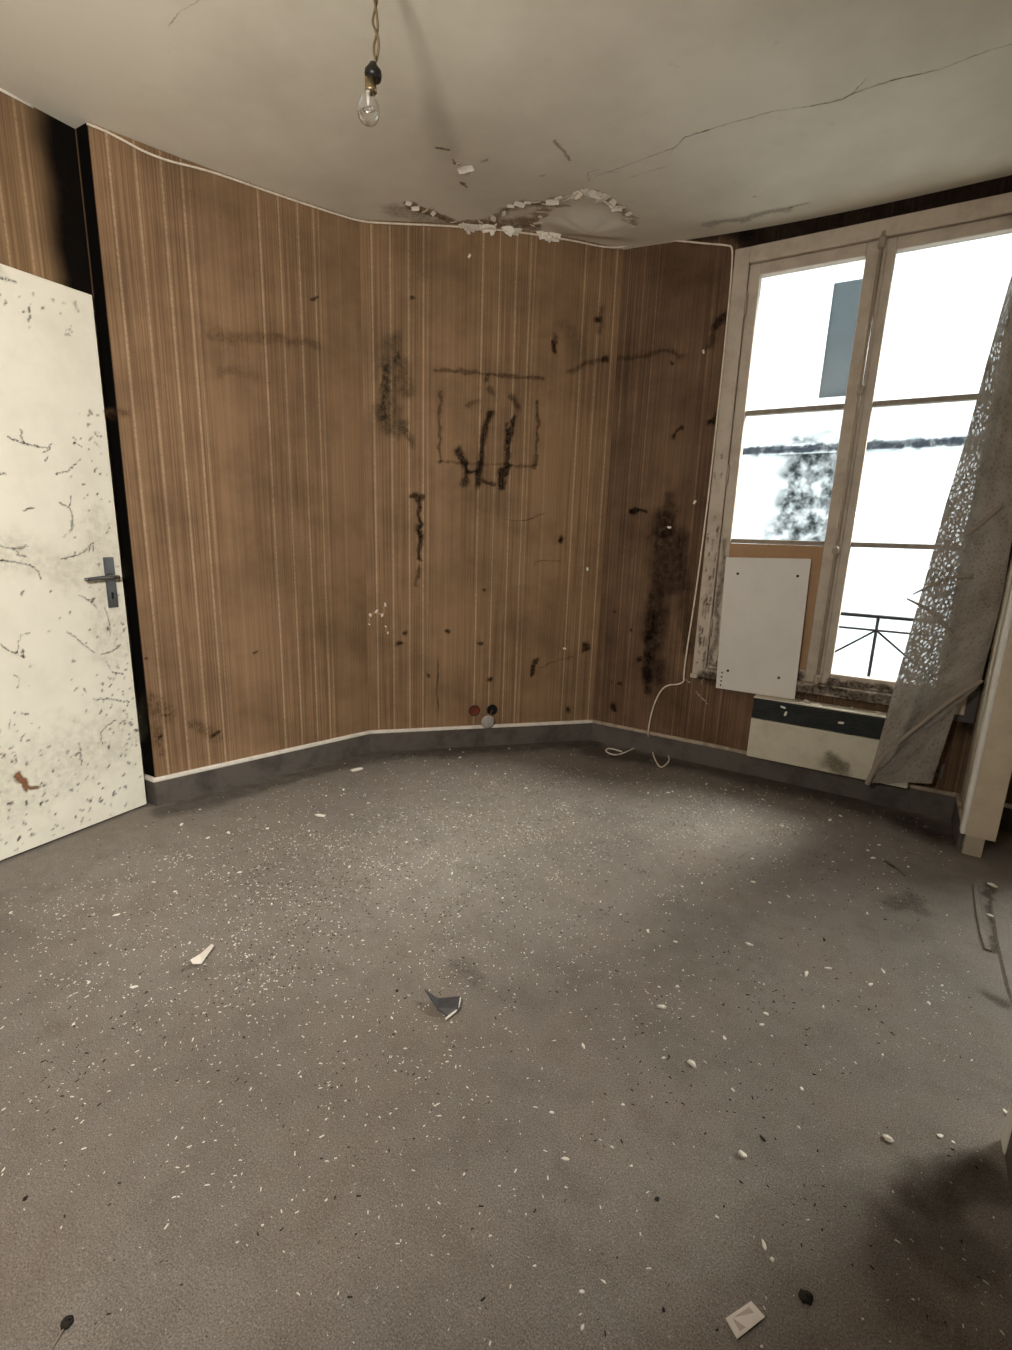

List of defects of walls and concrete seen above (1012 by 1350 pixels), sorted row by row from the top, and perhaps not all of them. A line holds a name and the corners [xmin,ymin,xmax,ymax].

peeling [404,189,637,243]
leakage [629,507,678,693]